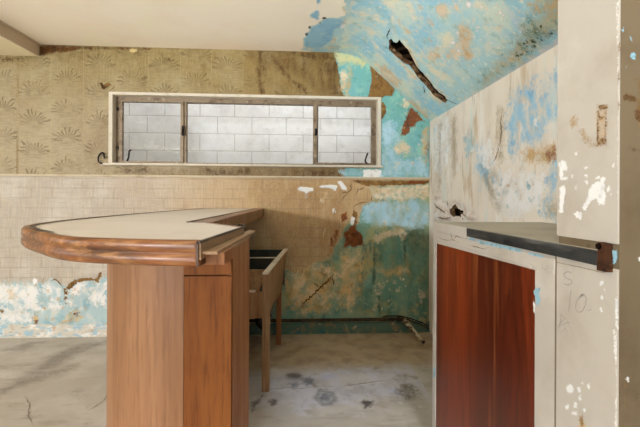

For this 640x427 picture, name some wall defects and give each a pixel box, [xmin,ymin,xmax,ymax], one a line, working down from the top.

crack [386,30,456,104]
damp [474,0,558,89]
rust [569,103,610,148]
peeling [270,0,466,323]
rust [520,140,557,167]
peeling [573,167,618,220]
peeling [0,272,107,325]
crack [302,274,335,306]
damp [249,361,432,426]